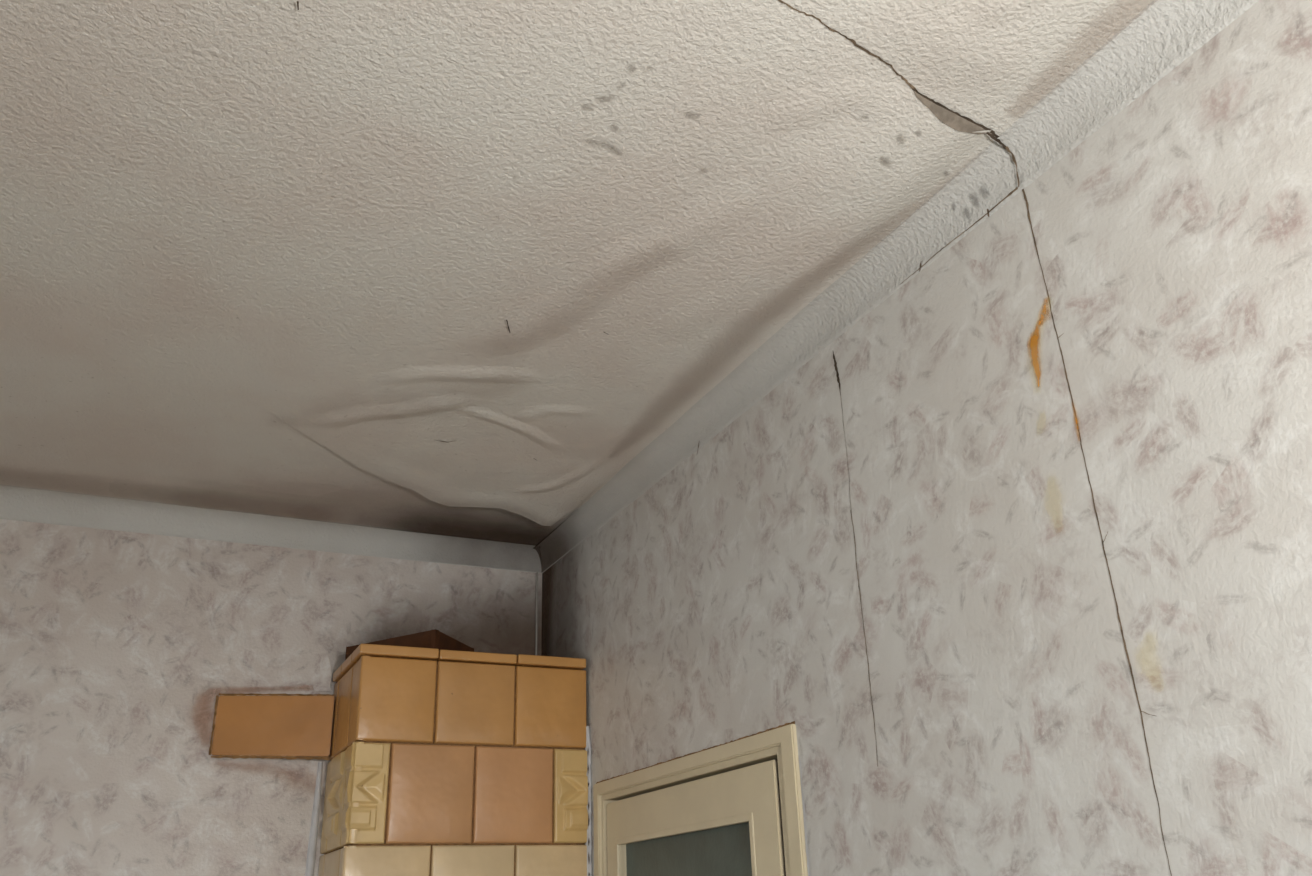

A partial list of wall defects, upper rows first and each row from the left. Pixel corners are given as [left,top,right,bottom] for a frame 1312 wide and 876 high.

crack [778,0,1172,876]